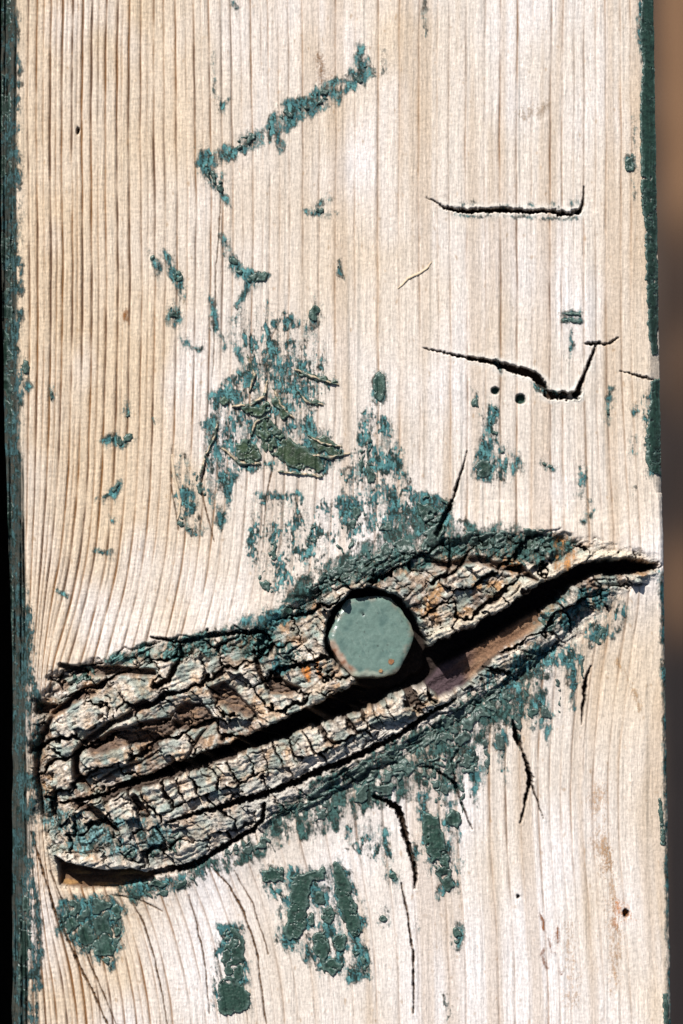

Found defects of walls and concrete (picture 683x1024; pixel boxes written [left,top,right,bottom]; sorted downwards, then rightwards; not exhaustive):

peeling [195,44,384,207]
crack [431,187,585,217]
crack [424,337,618,401]
peeling [1,0,181,1024]
peeling [70,233,577,684]
crack [416,543,451,583]
crack [445,459,465,513]
peeling [55,587,627,984]
crack [45,557,656,1024]
peeling [212,922,251,1016]